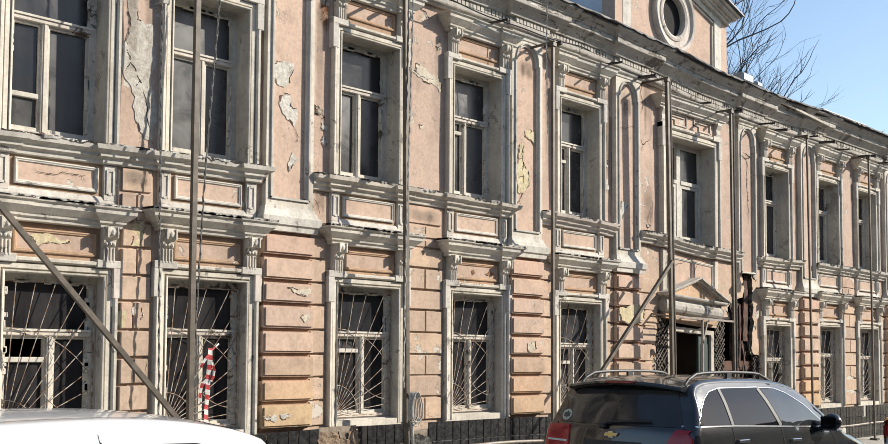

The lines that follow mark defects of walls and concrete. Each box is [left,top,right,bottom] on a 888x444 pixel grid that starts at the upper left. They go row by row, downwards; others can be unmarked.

peeling [121,0,157,140]
peeling [275,60,298,127]
peeling [409,63,442,92]
peeling [517,129,536,194]
peeling [30,233,71,246]
spalling [620,294,664,374]
spalling [317,430,360,444]